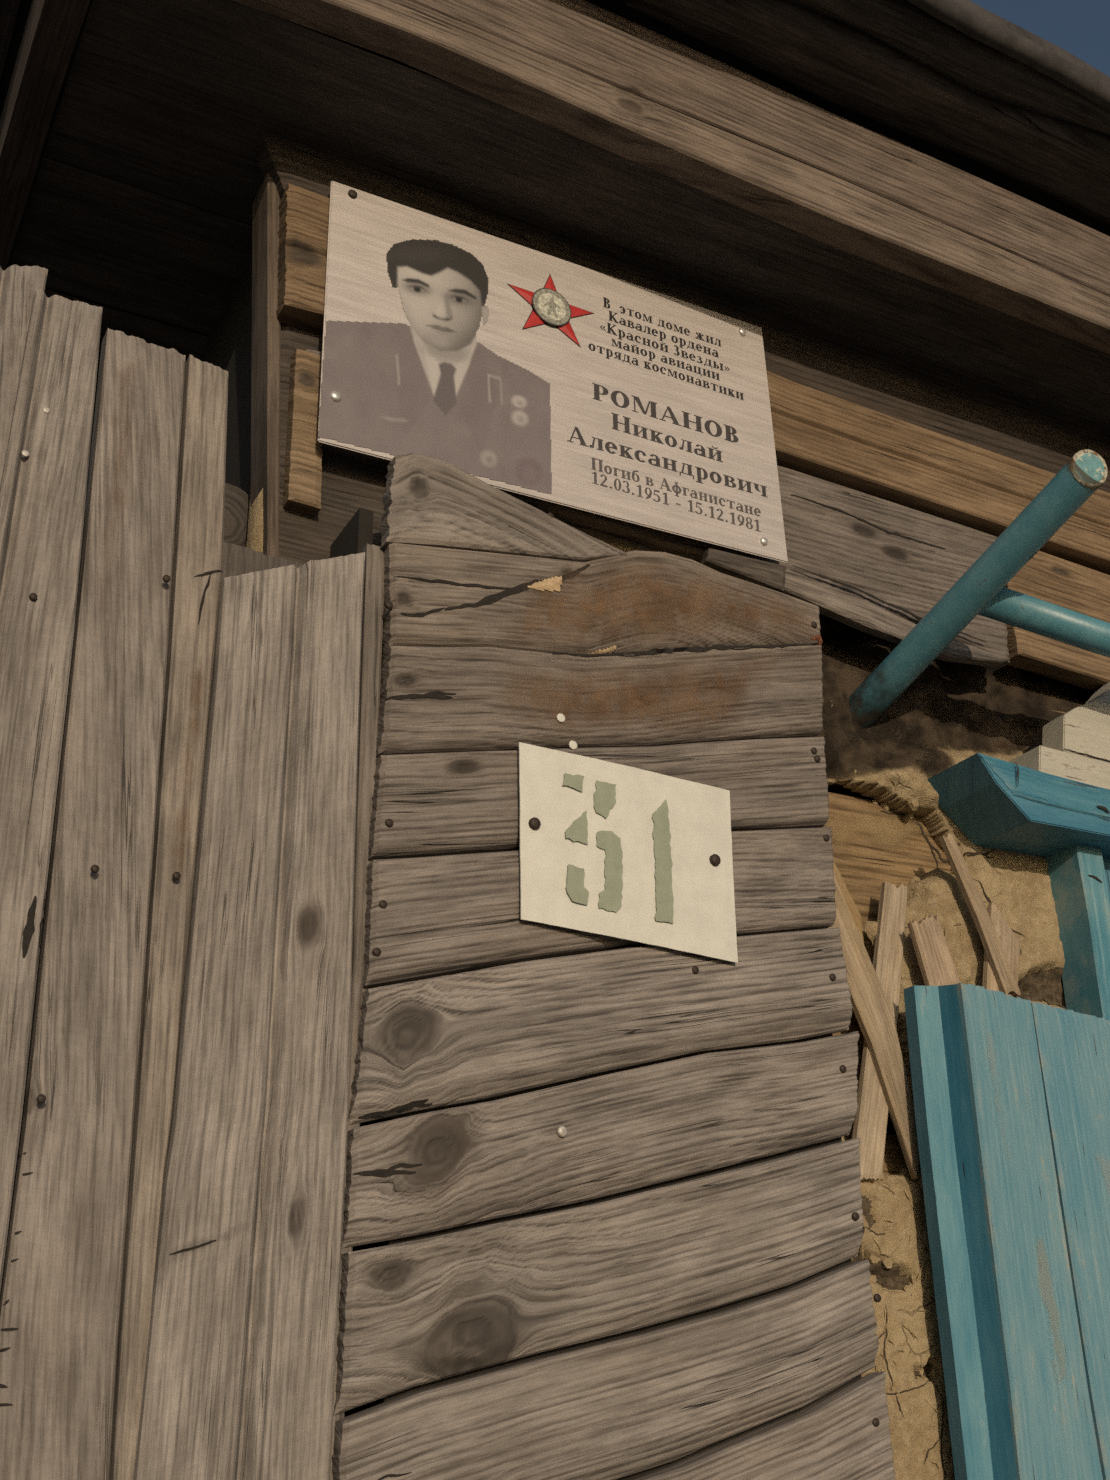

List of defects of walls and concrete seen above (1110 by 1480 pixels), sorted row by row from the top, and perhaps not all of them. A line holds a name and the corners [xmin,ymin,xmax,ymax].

crack [395,564,590,617]
damp [817,613,1095,779]
flaking render [826,799,920,846]
crack [880,810,1024,955]
flaking render [862,921,878,948]
spalling [1018,967,1066,1008]
crack [878,1307,947,1480]